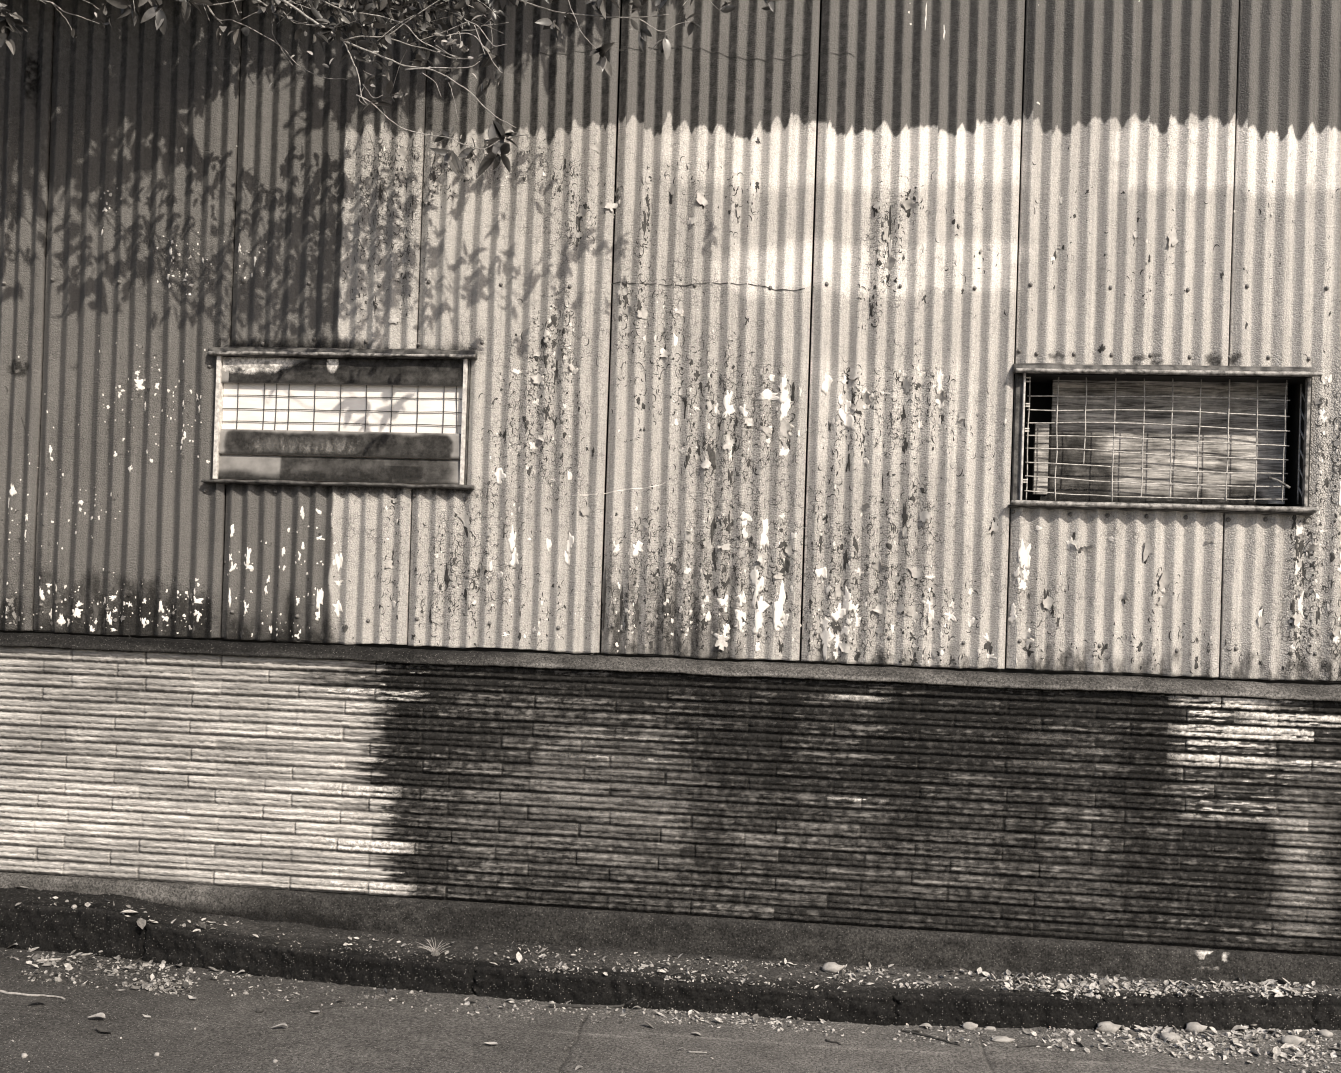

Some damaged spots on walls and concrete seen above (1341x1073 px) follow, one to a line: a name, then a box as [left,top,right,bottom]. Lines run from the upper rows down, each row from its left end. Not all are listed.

peeling [338,113,623,324]
peeling [1124,210,1187,304]
peeling [370,150,1000,668]
peeling [0,394,209,638]
peeling [224,501,354,642]
peeling [1008,526,1262,674]
peeling [1257,606,1271,628]
peeling [1282,375,1341,677]